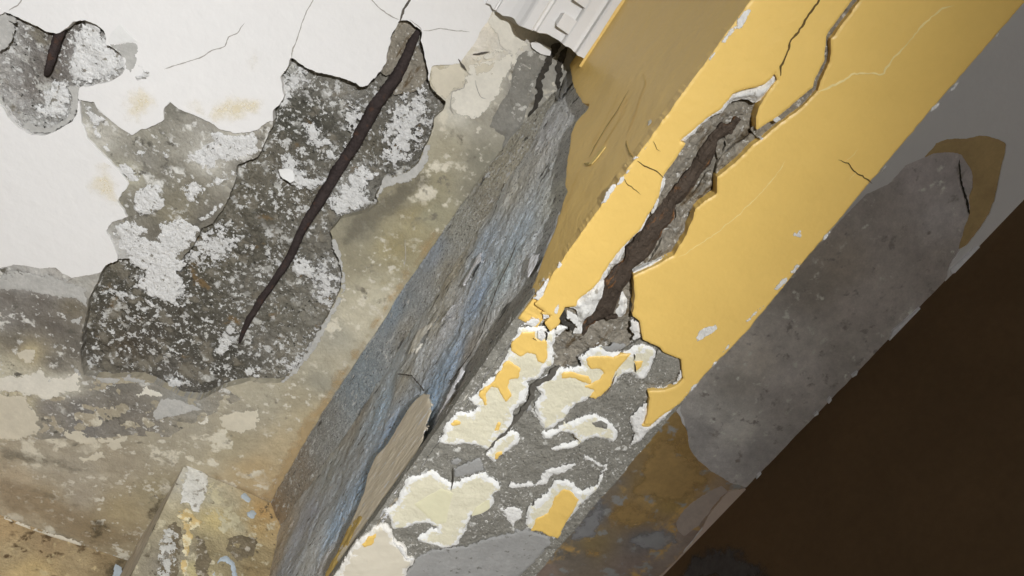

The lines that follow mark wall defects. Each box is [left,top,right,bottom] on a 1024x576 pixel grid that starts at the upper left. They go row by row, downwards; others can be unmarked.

crack [166,24,244,69]
crack [751,0,954,140]
crack [624,141,664,194]
crack [840,150,871,183]
crack [959,160,970,214]
peeling [0,11,577,561]
flaking render [269,69,1006,576]